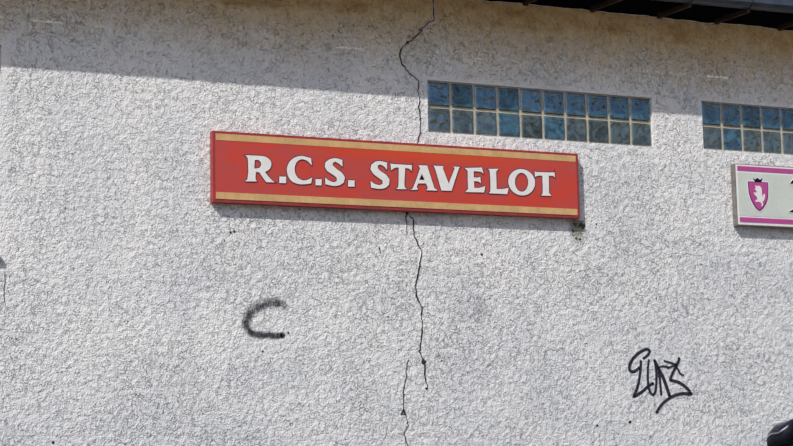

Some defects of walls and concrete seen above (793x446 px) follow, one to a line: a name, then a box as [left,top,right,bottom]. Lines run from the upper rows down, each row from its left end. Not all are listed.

crack [399,0,435,144]
crack [403,212,428,446]